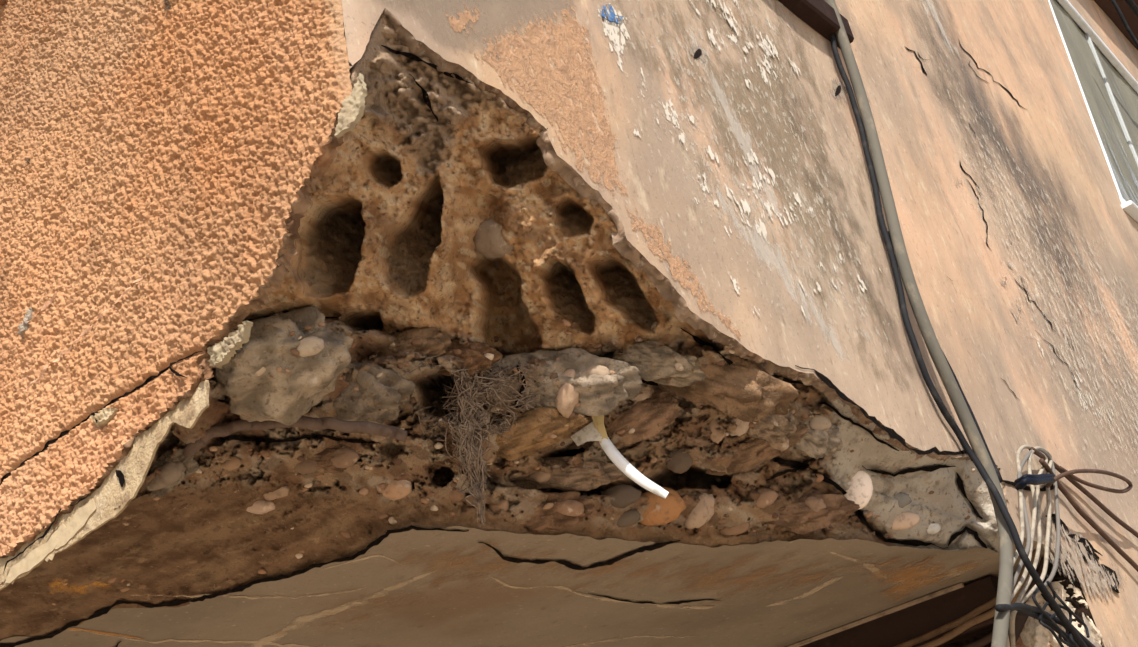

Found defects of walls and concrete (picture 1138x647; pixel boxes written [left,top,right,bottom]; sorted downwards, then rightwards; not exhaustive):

peeling [654,97,694,150]
peeling [694,148,813,241]
damp [655,0,886,335]
crack [906,47,927,75]
crack [960,162,992,251]
crack [959,41,1025,109]
damp [961,61,1071,284]
peeling [798,254,867,319]
crack [0,351,203,485]
peeling [0,379,210,591]
crack [0,525,719,647]
spalling [1020,510,1127,647]